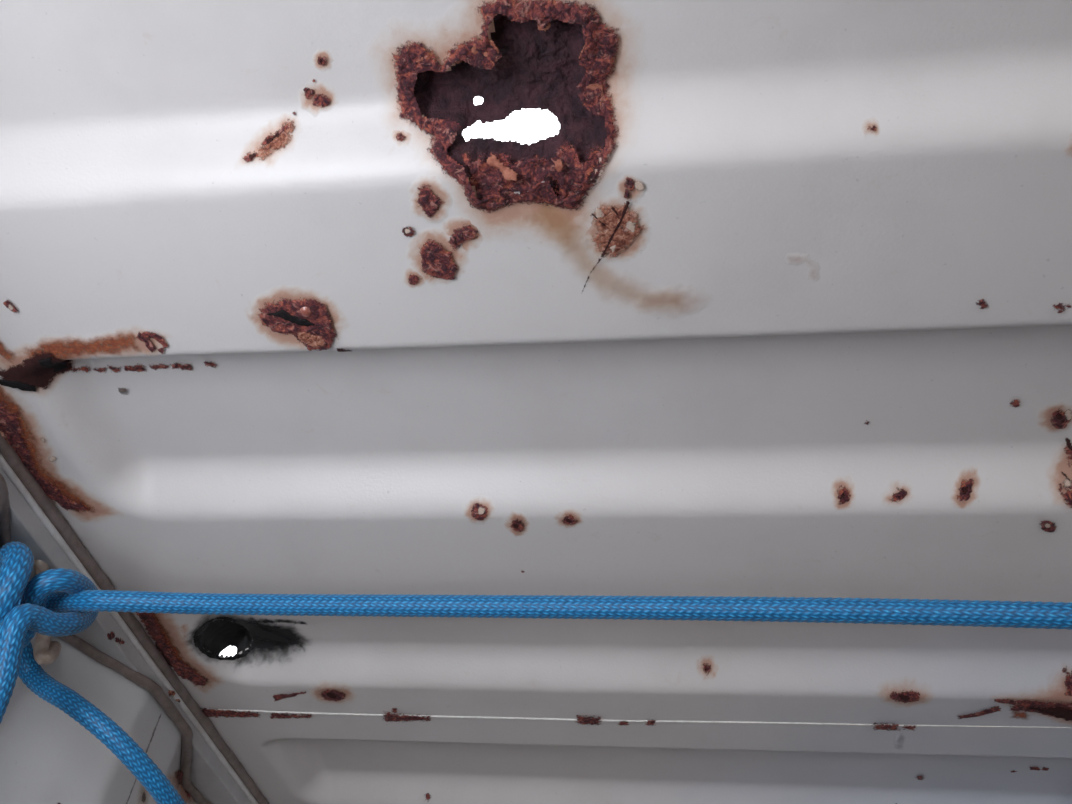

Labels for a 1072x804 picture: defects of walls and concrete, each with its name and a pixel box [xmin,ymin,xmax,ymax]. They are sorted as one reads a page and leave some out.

corrosion [233,48,340,172]
corrosion [365,0,649,289]
corrosion [243,284,351,352]
corrosion [0,323,174,525]
corrosion [503,510,532,537]
corrosion [553,507,585,529]
corrosion [828,474,857,511]
corrosion [949,464,983,510]
corrosion [1036,401,1072,514]
corrosion [133,612,227,695]
corrosion [202,677,360,719]
corrosion [957,659,1072,728]